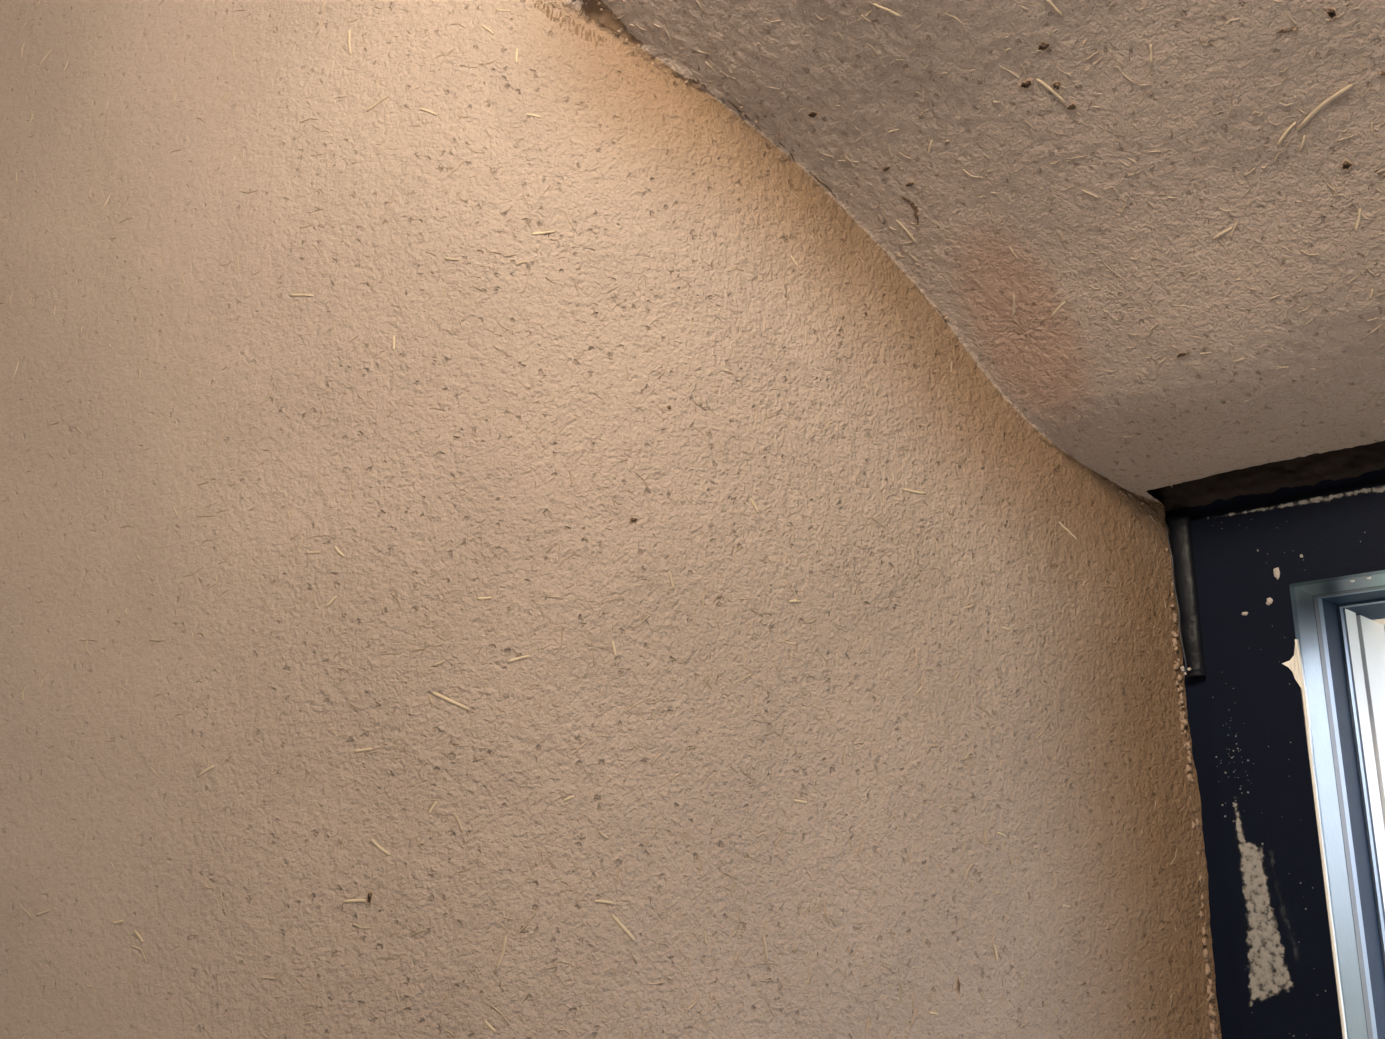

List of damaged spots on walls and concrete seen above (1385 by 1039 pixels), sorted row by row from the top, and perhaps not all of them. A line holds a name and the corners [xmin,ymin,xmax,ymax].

spalling [532,0,642,47]